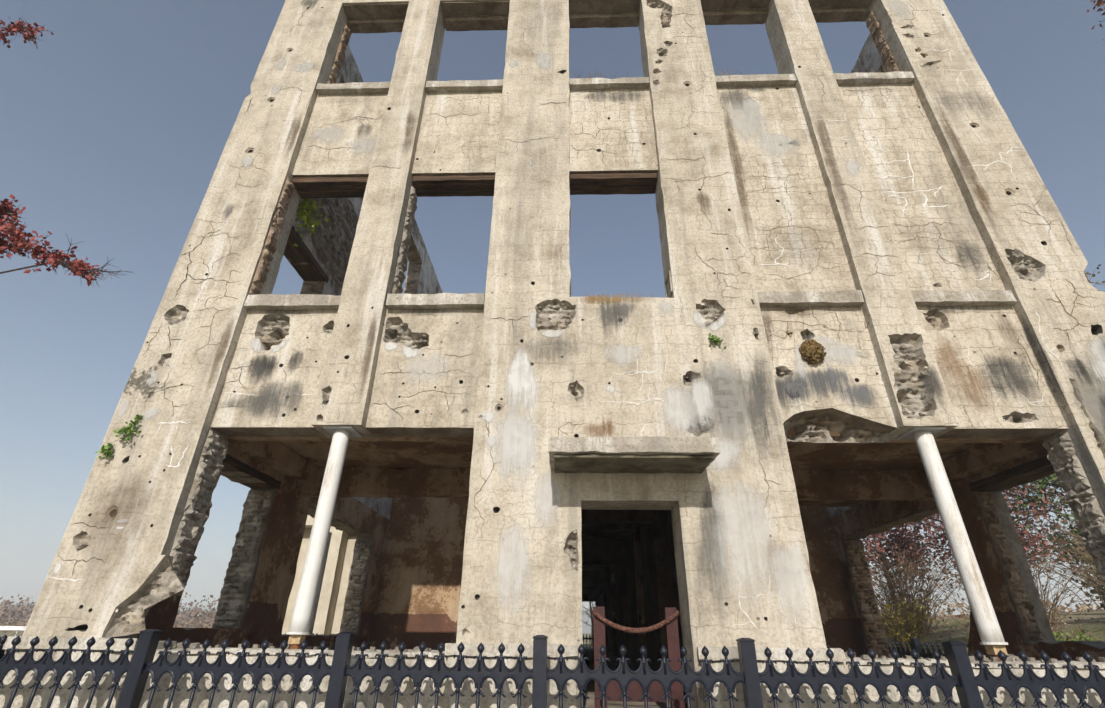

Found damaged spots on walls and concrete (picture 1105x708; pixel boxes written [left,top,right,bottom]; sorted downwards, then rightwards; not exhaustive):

crack [668,1,991,298]
crack [968,147,1077,248]
spalling [1004,248,1046,282]
crack [145,219,242,467]
damp [230,338,300,412]
spalling [255,312,290,351]
spalling [534,299,577,332]
damp [664,348,873,468]
crack [768,312,866,347]
spalling [888,333,937,419]
damp [1023,321,1063,394]
damp [1070,422,1105,499]